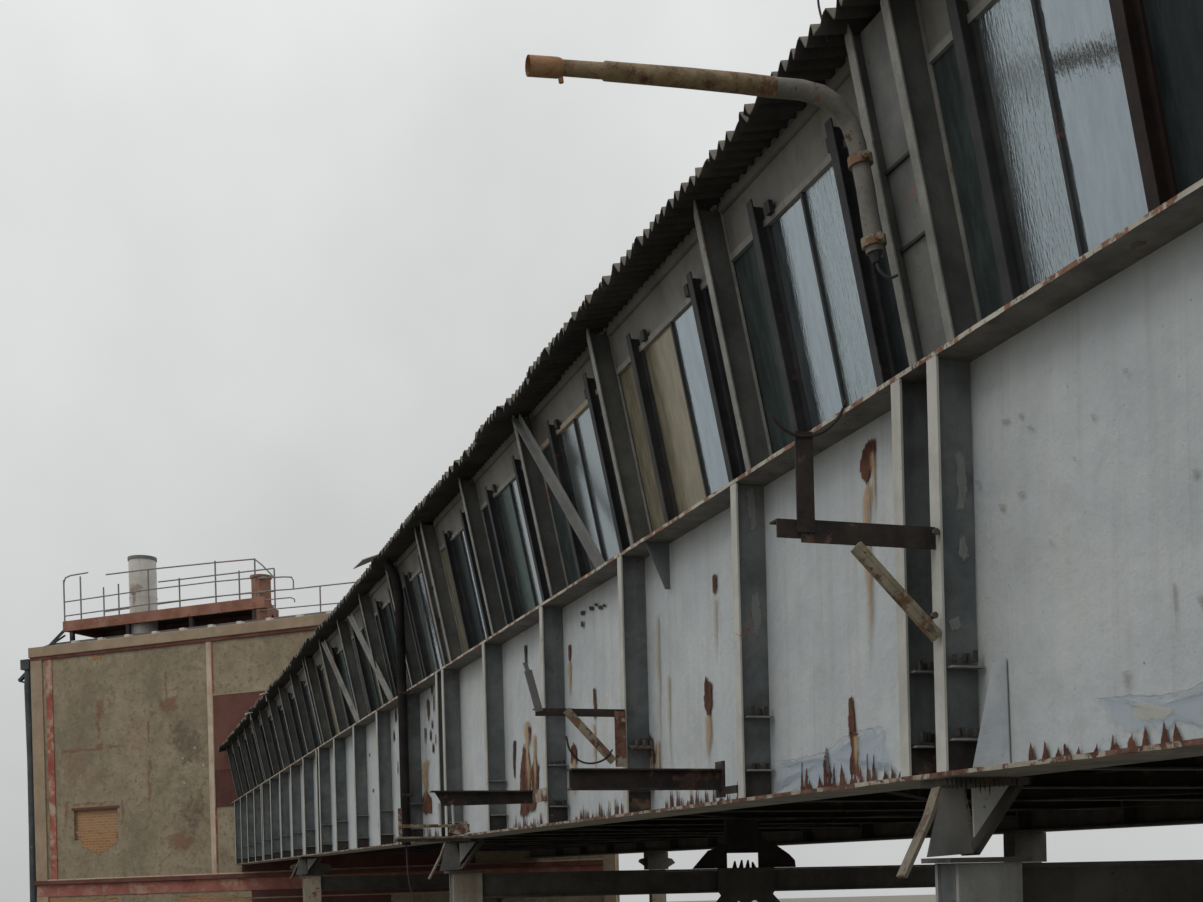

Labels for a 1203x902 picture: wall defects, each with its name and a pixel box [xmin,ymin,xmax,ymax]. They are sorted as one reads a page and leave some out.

rust [859,438,875,523]
rust [704,676,712,748]
rust [800,696,901,790]
rust [1028,721,1181,761]